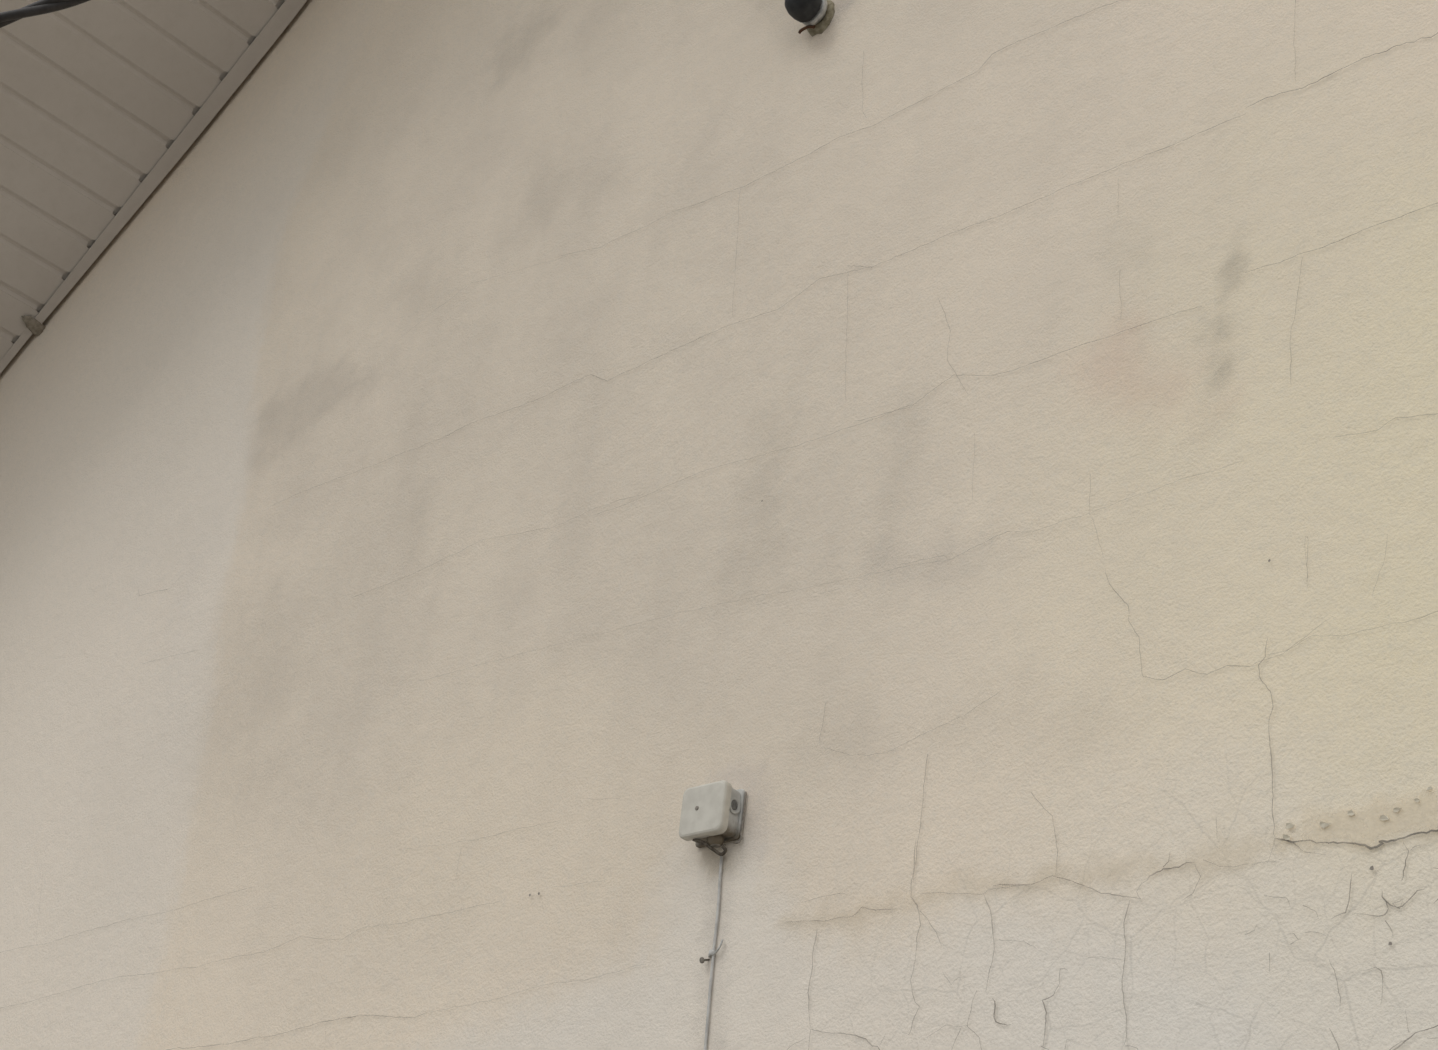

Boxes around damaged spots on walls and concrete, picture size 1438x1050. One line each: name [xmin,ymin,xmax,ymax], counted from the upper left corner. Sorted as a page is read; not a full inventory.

crack [1228,661,1438,927]
crack [796,920,878,1047]
crack [987,861,1201,1037]